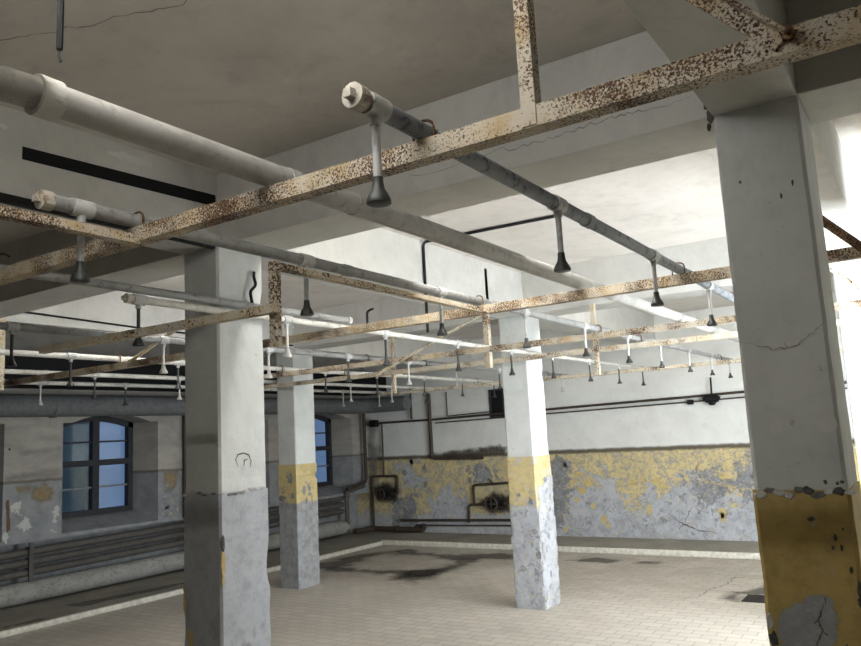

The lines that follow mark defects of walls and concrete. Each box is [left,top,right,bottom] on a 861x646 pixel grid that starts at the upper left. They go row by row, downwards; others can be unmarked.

crack [0,0,187,41]
crack [743,324,822,351]
peeling [279,473,313,504]
peeling [391,457,501,532]
peeling [2,501,33,544]
peeling [510,450,857,610]
peeling [849,566,861,608]
peeling [766,595,848,646]
crack [814,597,828,646]